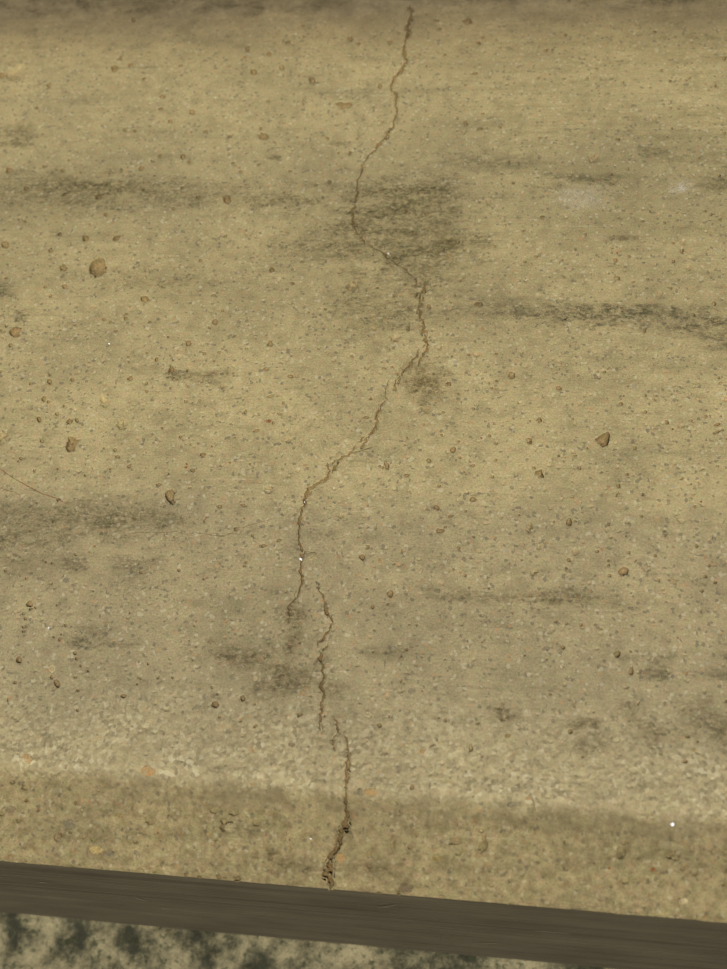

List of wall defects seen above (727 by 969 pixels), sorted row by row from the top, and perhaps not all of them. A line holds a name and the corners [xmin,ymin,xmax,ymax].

crack [286,5,431,890]